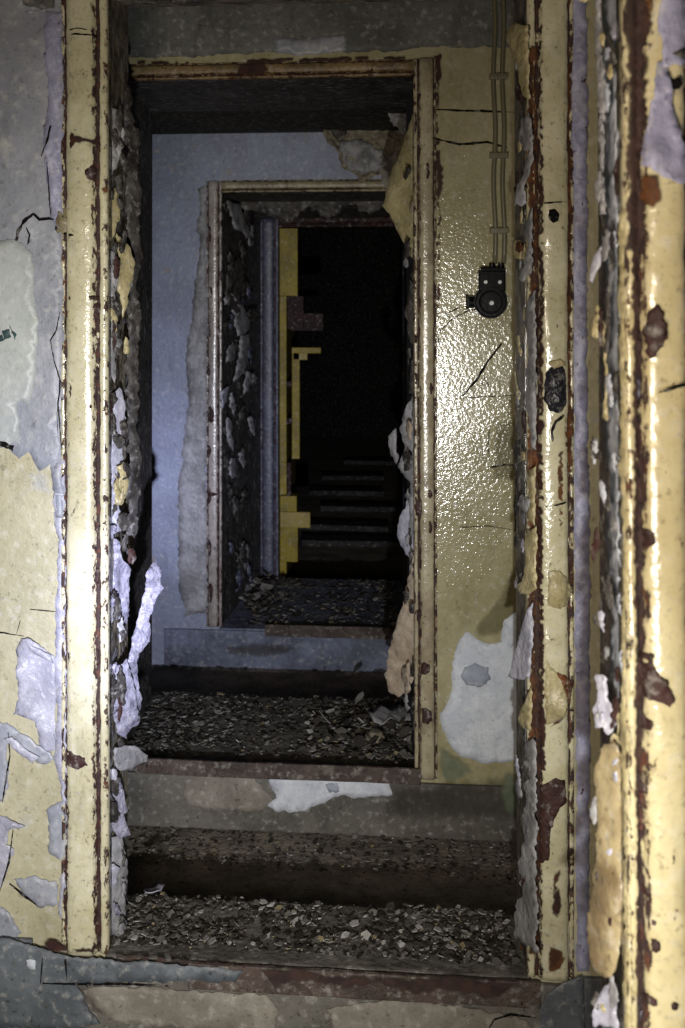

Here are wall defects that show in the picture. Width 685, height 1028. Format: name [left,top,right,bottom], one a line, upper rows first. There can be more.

peeling [0,0,67,918]
crack [15,126,73,245]
rust [62,133,101,159]
rust [89,296,117,352]
peeling [111,77,164,936]
peeling [0,907,279,1028]
spalling [182,776,392,813]
spalling [440,290,539,953]
rust [527,46,567,972]
rust [558,62,573,525]
peeling [571,0,634,1028]
rust [624,0,675,1028]